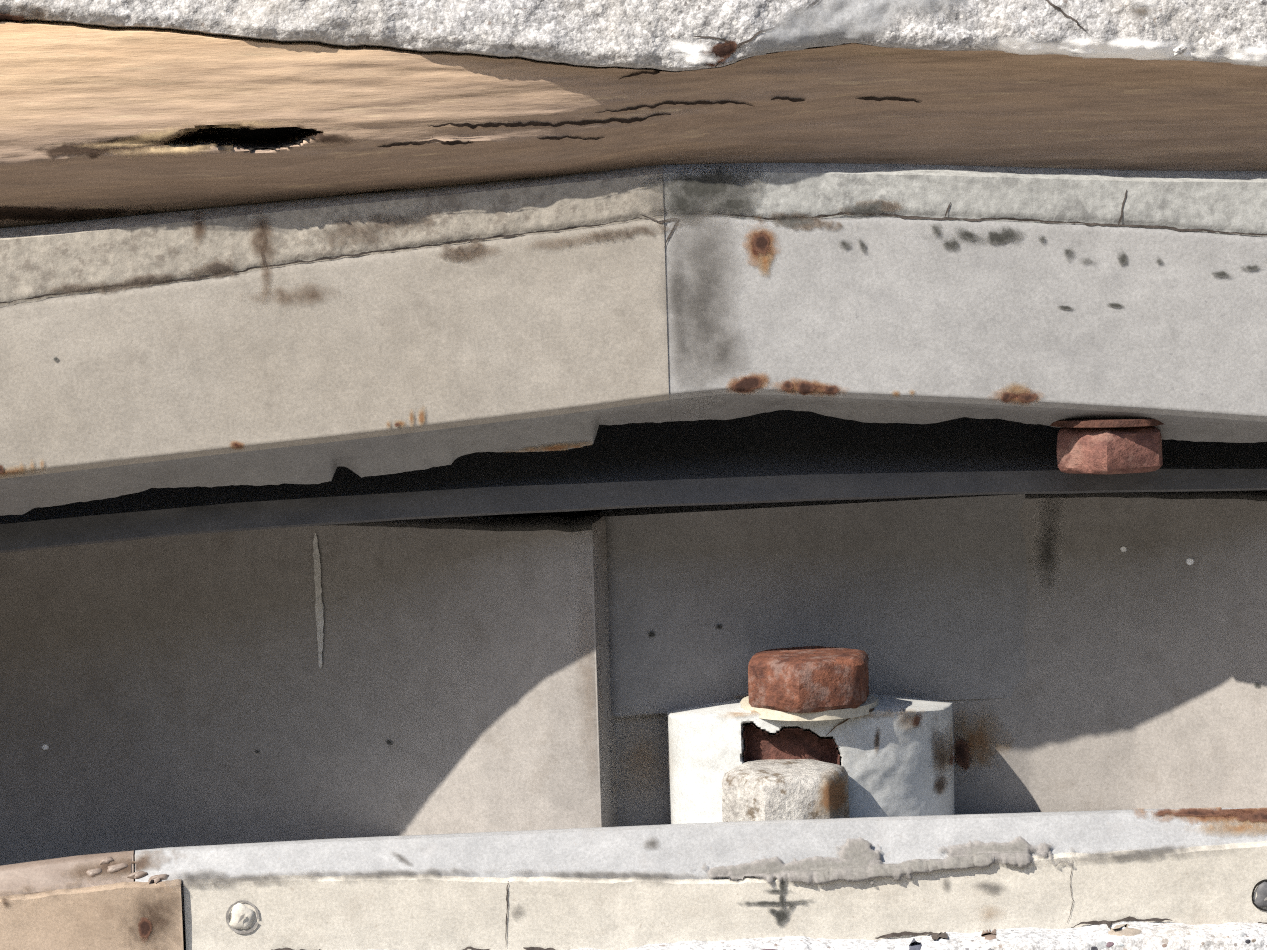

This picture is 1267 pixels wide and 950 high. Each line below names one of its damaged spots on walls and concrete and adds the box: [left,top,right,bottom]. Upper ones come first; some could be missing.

water stain [649,167,758,221]
mould [847,203,881,216]
mould [932,225,1022,249]
rust [746,230,775,273]
mould [1212,265,1258,277]
water stain [670,235,732,371]
rust [728,375,838,395]
rust [934,719,992,793]
rust [1155,807,1267,832]